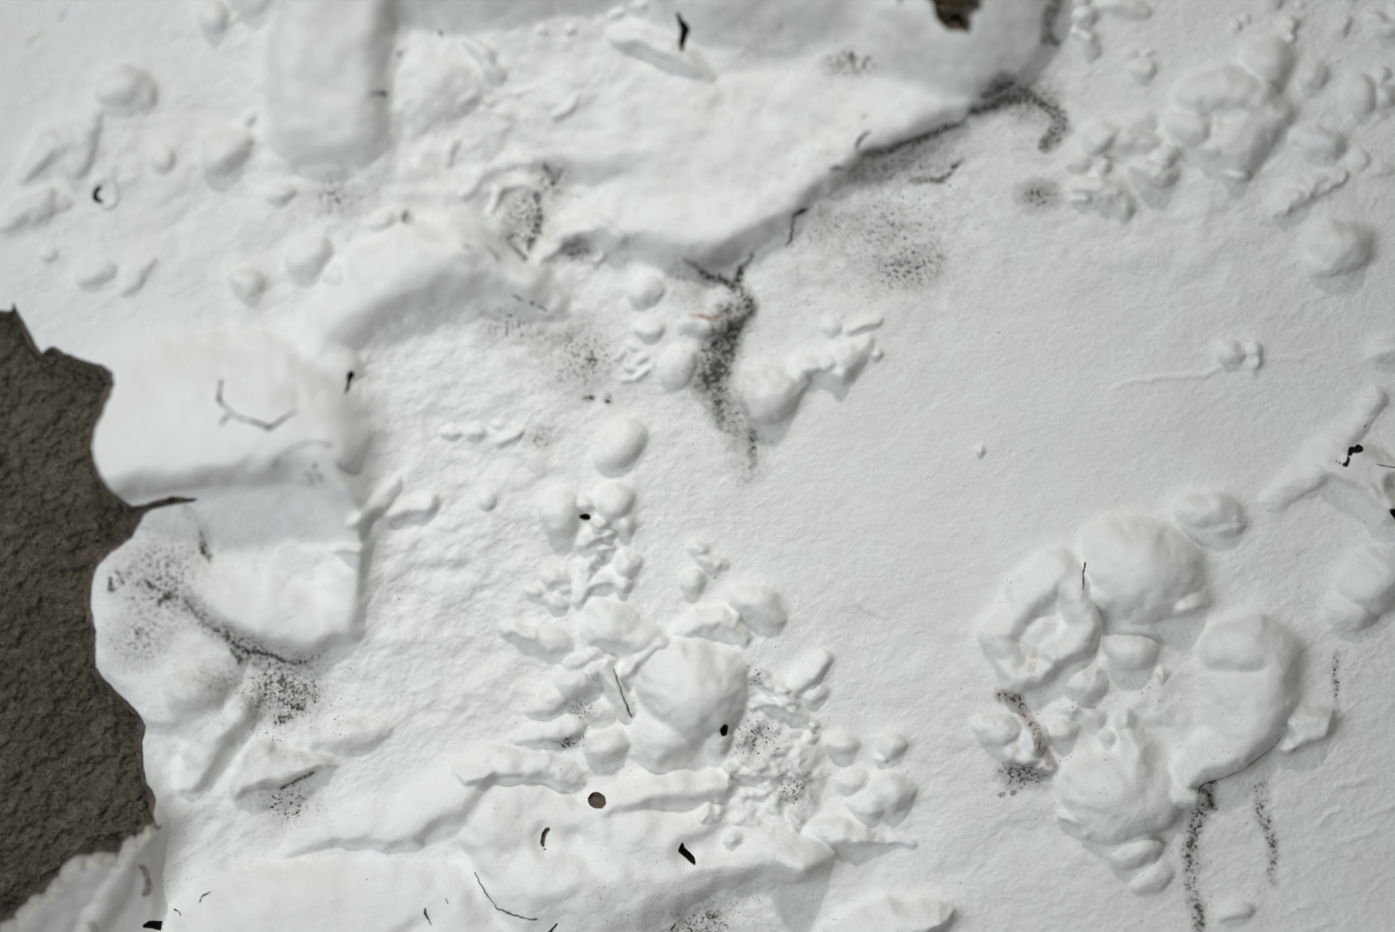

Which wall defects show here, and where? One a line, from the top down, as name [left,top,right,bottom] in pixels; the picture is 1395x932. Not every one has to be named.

spalling [928,0,984,34]
water stain [674,250,756,482]
spalling [0,303,255,932]
water stain [104,531,328,726]